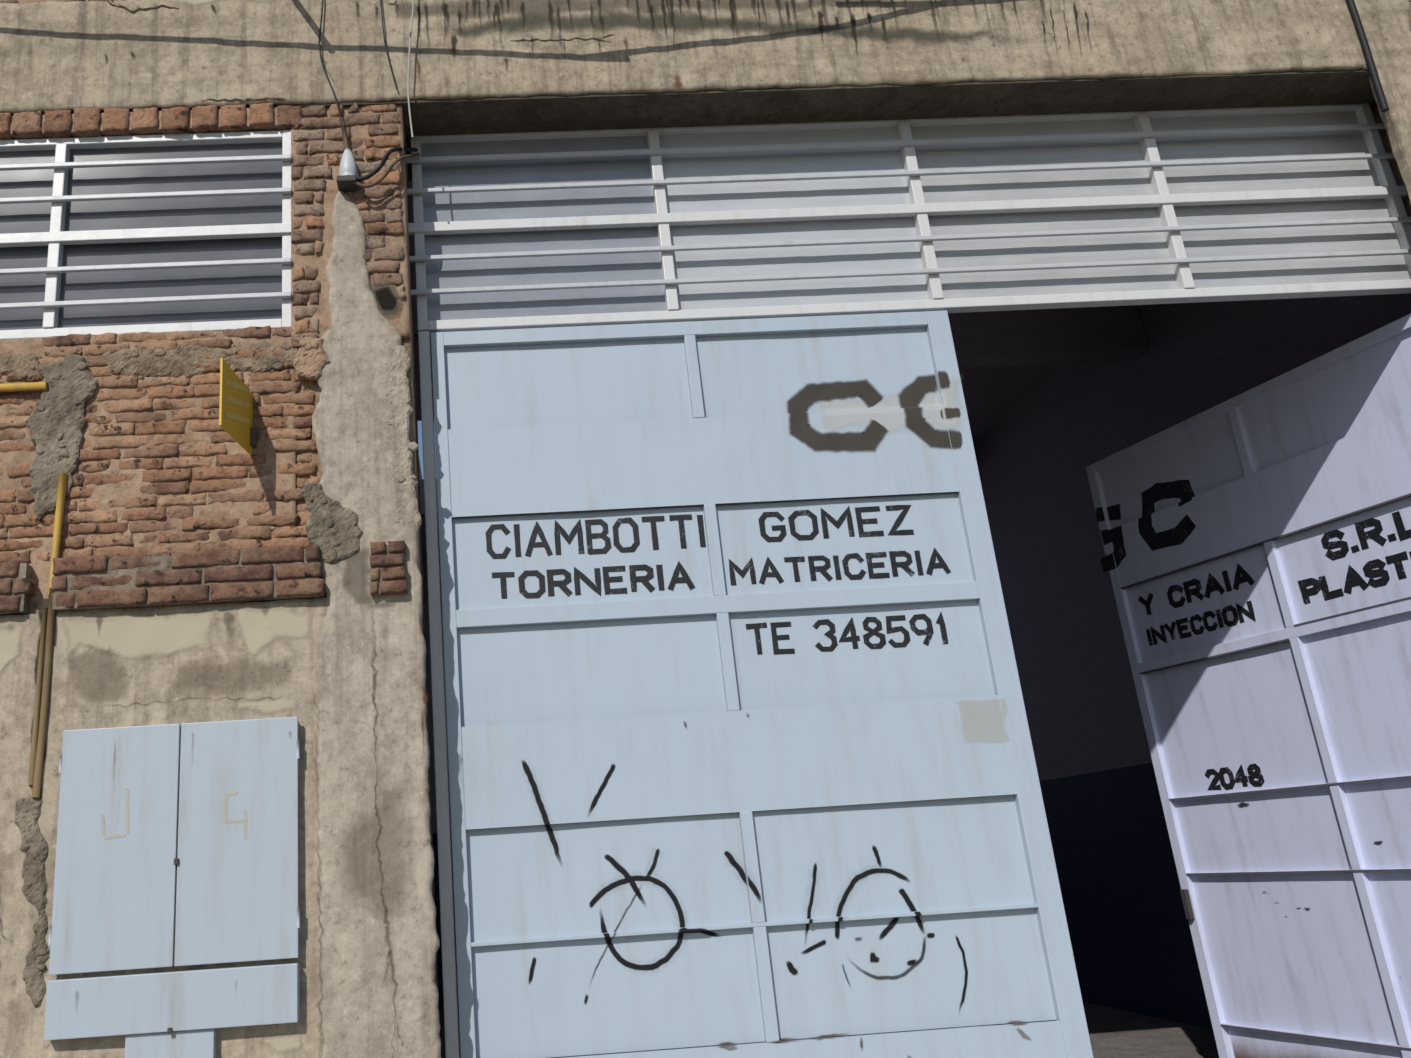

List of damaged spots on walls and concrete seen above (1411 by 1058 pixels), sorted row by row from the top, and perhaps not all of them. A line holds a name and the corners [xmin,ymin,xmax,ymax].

leakage [417,0,524,53]
leakage [548,0,571,28]
leakage [636,0,906,50]
spalling [0,101,405,520]
spalling [382,343,422,530]
spalling [301,480,362,564]
spalling [14,789,50,1008]